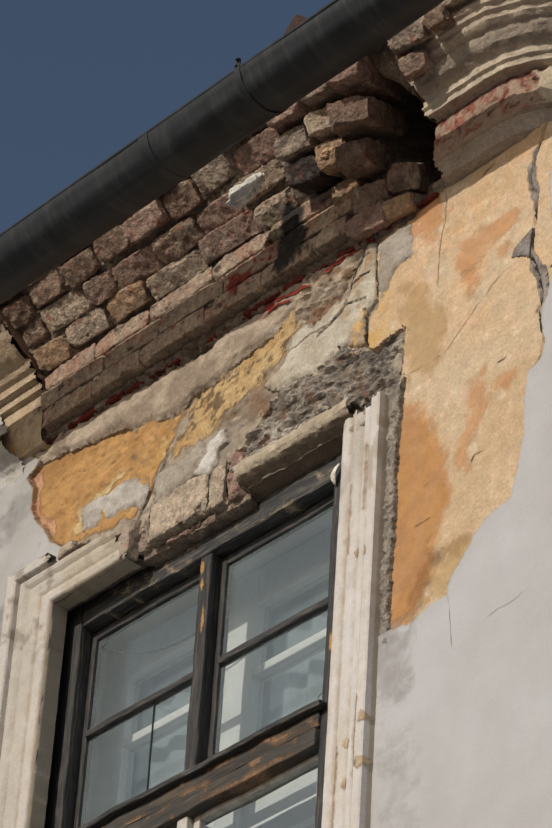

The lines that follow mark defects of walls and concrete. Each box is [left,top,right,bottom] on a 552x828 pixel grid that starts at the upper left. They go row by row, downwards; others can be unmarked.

spalling [0,0,552,644]
crack [437,194,447,288]
crack [527,135,552,333]